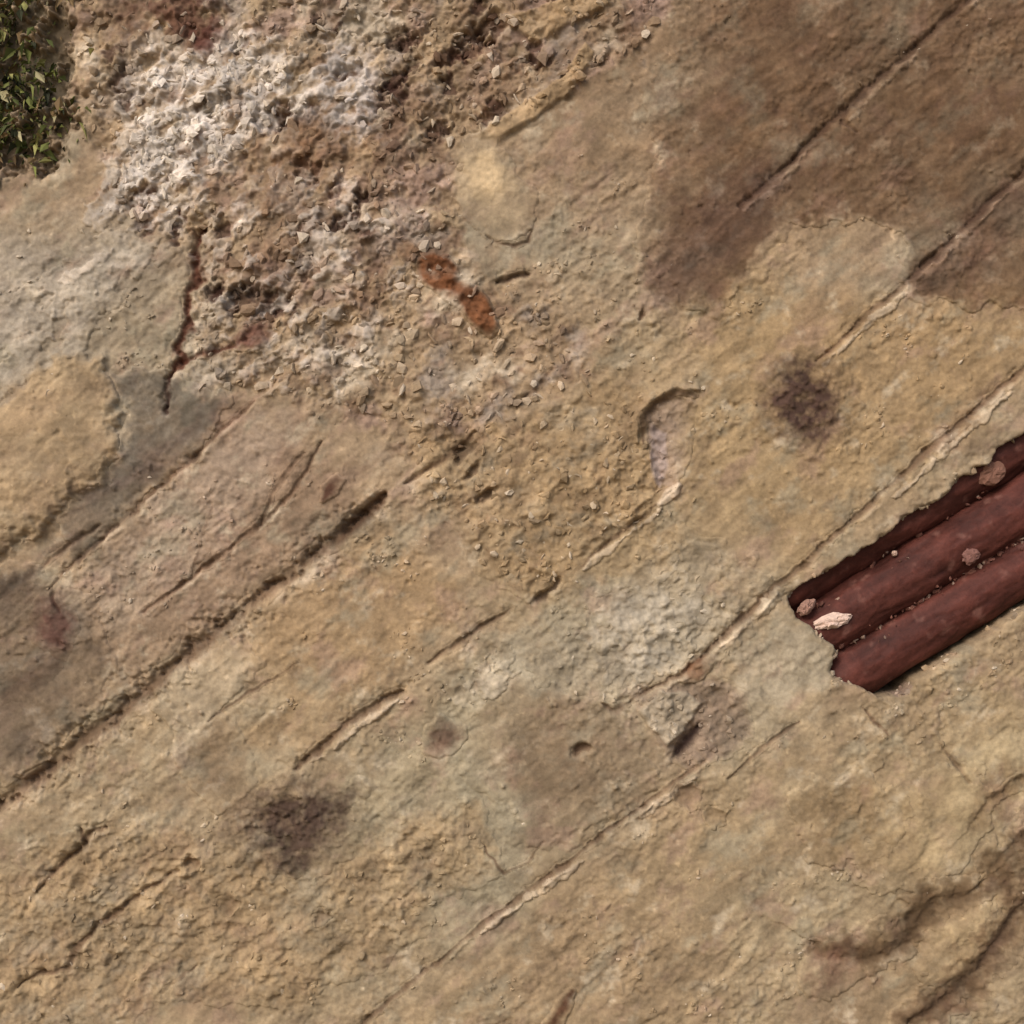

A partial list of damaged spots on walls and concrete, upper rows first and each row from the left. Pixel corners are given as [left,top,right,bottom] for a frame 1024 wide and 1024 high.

crack [166,210,233,377]
corrosion [397,241,501,340]
leakage [0,14,432,791]
crack [515,368,554,410]
crack [42,398,257,581]
crack [573,491,671,575]
spalling [900,461,1006,521]
spalling [962,548,981,566]
crack [0,430,477,816]
crack [426,605,516,666]
spalling [787,590,1024,699]